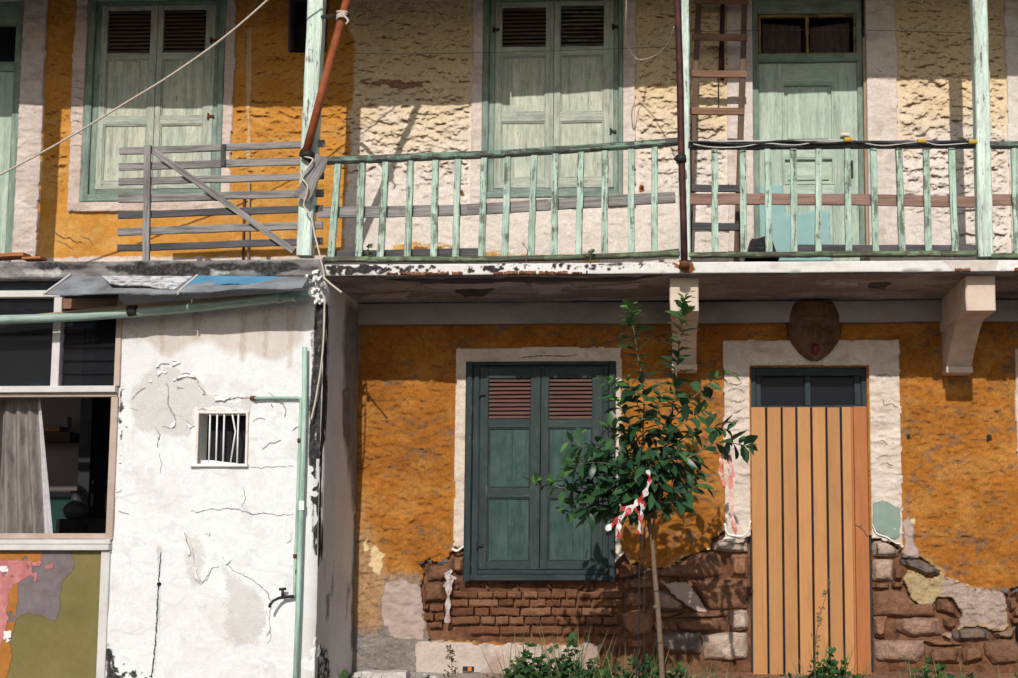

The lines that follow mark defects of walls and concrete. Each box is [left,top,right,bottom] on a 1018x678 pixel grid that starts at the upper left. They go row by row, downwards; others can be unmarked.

peeling [131,360,252,439]
damp [309,302,329,566]
peeling [0,550,74,678]
crack [151,553,161,678]
spalling [363,521,751,660]
spalling [872,500,1018,665]